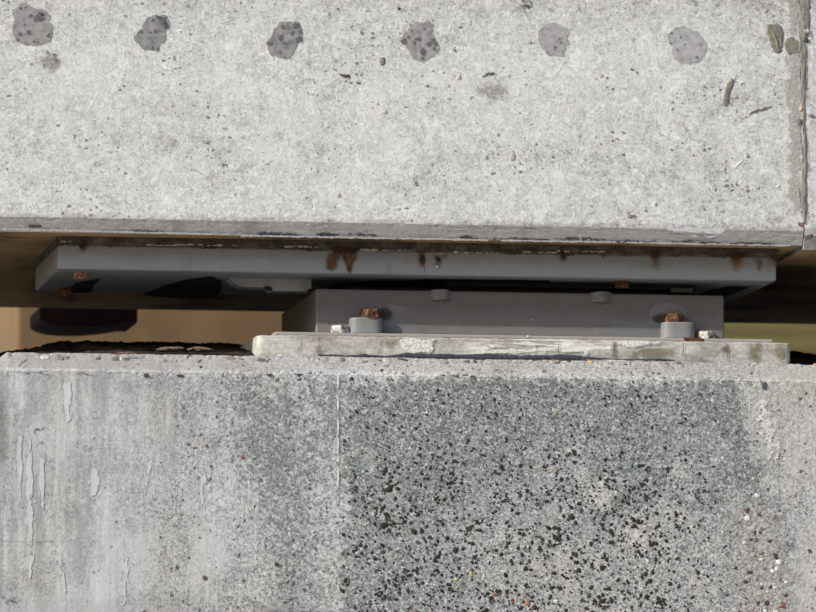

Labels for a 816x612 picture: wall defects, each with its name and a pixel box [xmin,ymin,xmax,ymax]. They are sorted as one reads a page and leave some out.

corrosion [327,247,358,273]
leakage [87,468,100,496]
leakage [14,434,45,578]